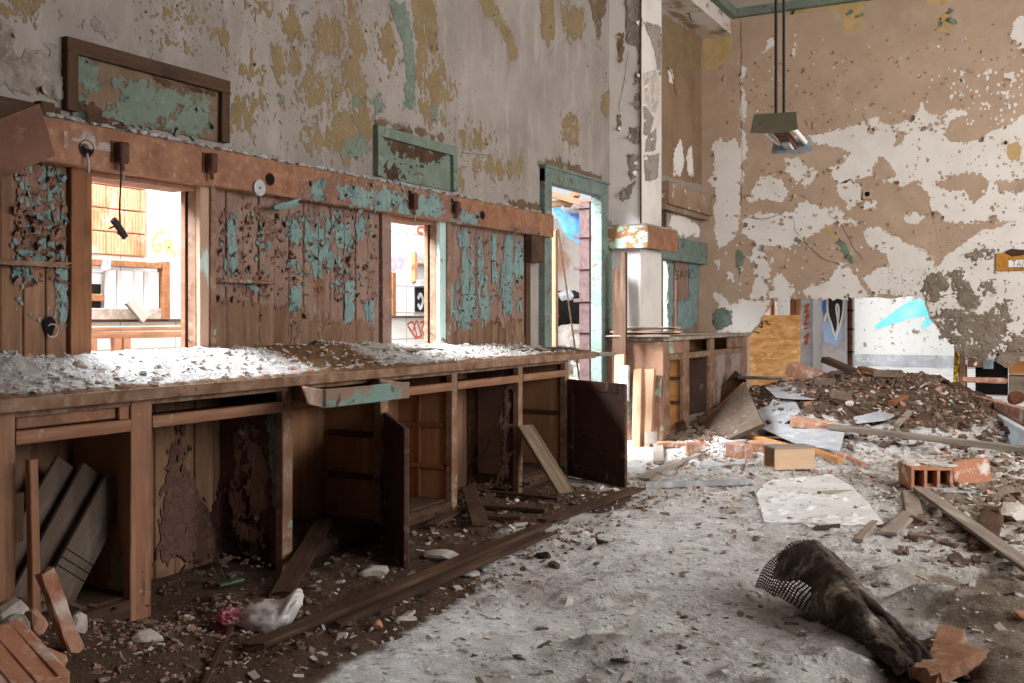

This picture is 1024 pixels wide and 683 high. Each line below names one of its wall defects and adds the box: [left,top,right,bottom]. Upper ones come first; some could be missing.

flaking render [0,0,63,102]
peeling [11,162,71,325]
peeling [72,56,217,142]
peeling [134,0,540,348]
peeling [538,0,587,66]
peeling [548,106,592,164]
peeling [598,0,1024,368]
peeling [154,413,276,567]